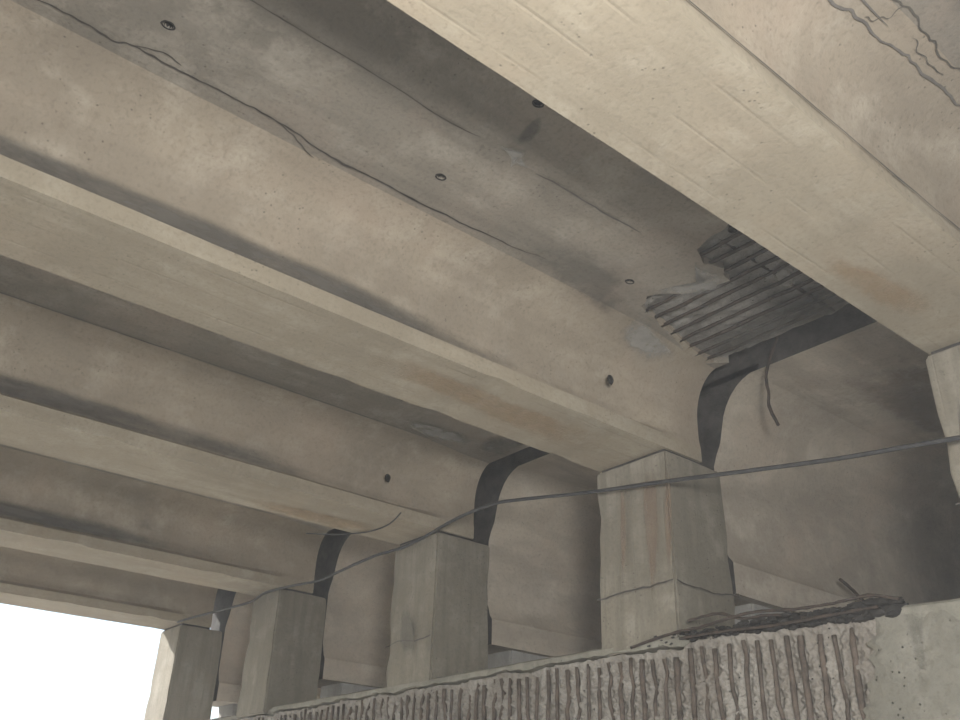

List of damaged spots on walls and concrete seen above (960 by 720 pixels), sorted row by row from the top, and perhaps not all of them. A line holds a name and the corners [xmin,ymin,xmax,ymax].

crack [38,0,547,260]
crack [537,174,639,232]
crack [688,0,960,229]
spalling [644,225,849,426]
spalling [238,578,909,720]
crack [597,579,740,601]